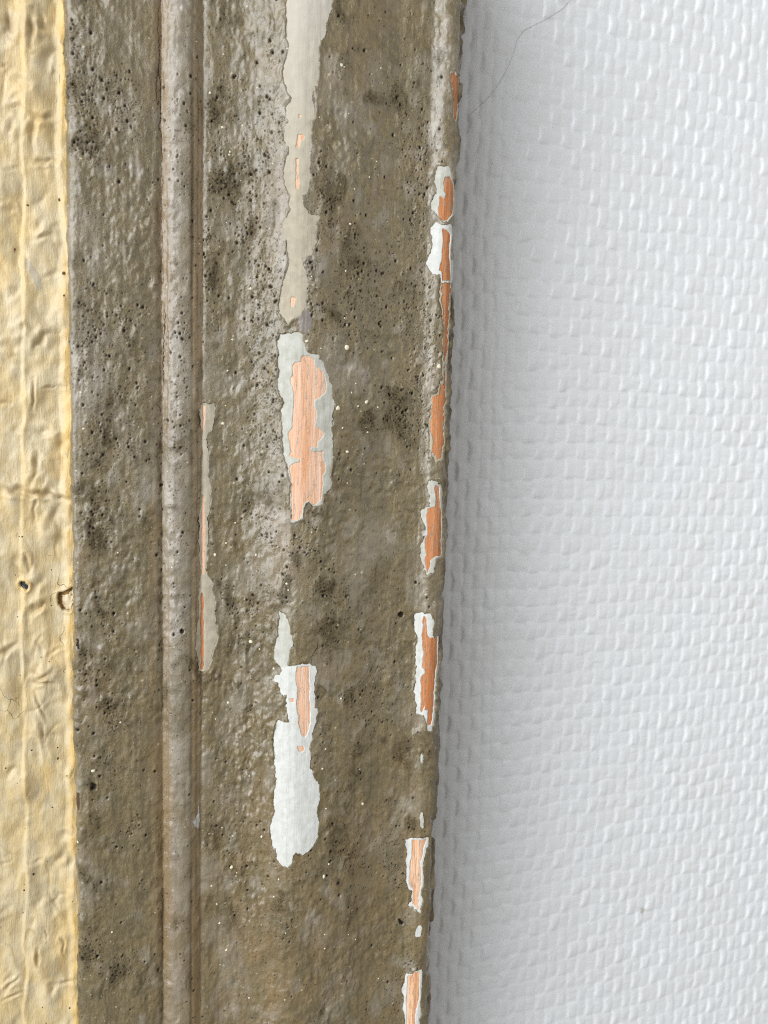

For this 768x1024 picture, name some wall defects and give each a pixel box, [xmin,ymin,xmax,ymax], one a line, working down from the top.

peeling [449,71,460,122]
peeling [277,0,335,523]
peeling [426,166,456,462]
peeling [180,403,218,671]
peeling [420,480,443,575]
peeling [398,612,439,731]
peeling [270,611,320,868]
peeling [405,837,429,937]
peeling [402,969,422,1024]